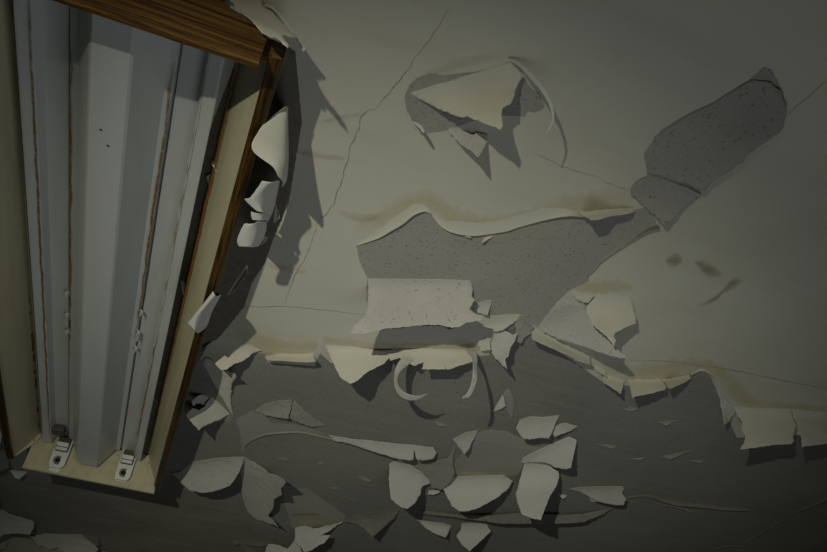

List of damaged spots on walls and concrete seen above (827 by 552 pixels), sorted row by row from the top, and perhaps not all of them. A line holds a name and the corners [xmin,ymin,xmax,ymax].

peeling [142,68,235,456]
peeling [188,0,306,364]
crack [231,12,447,314]
peeling [351,58,788,369]
flaking render [0,329,827,552]